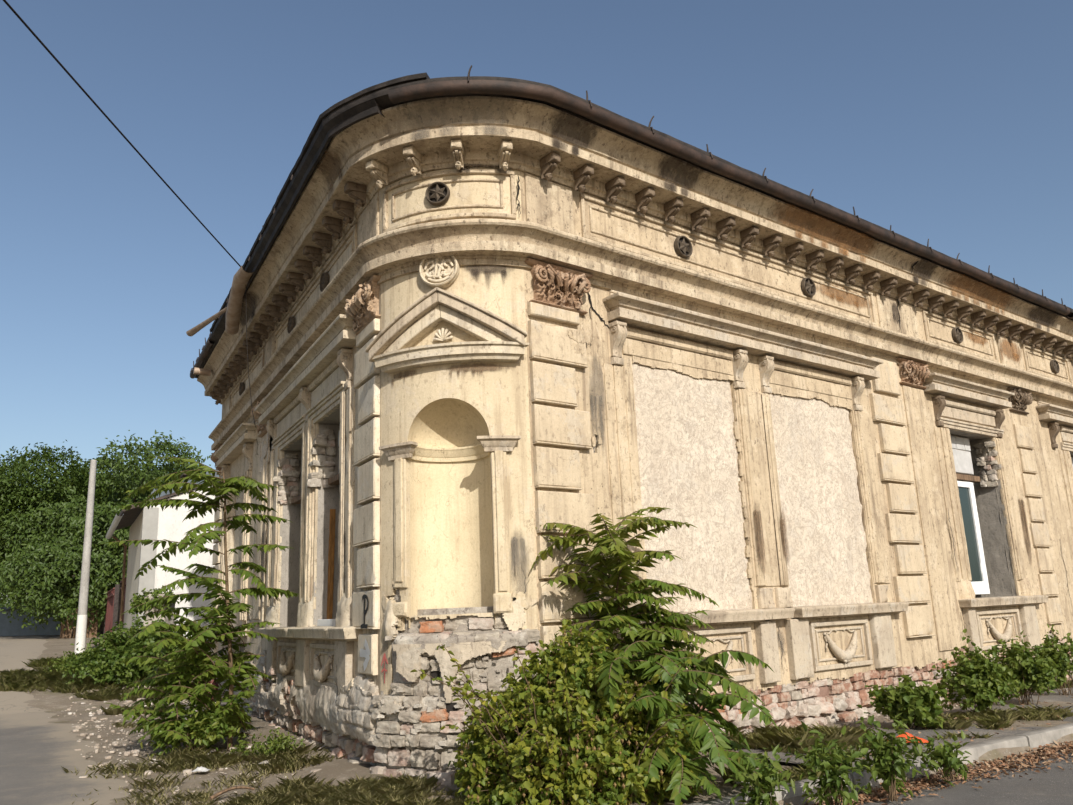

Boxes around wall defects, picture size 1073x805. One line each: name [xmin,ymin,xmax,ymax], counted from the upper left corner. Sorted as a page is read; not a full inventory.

leakage [552,110,597,155]
crack [514,176,522,215]
leakage [659,155,700,196]
flaking render [368,582,540,785]
flaking render [695,648,971,735]